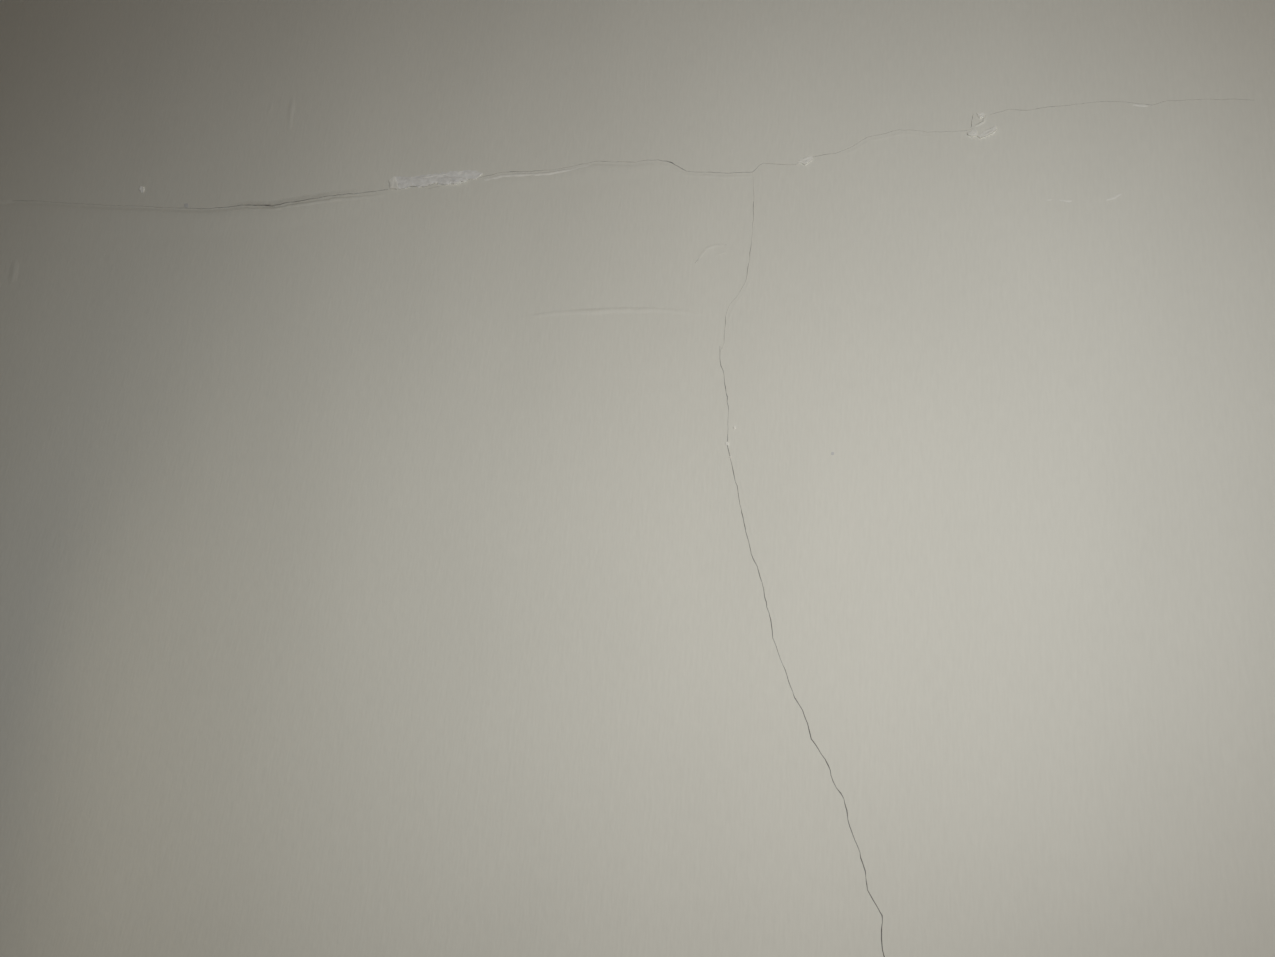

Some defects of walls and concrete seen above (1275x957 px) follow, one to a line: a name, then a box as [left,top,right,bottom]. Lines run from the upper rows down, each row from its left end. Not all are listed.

crack [720,189,890,957]